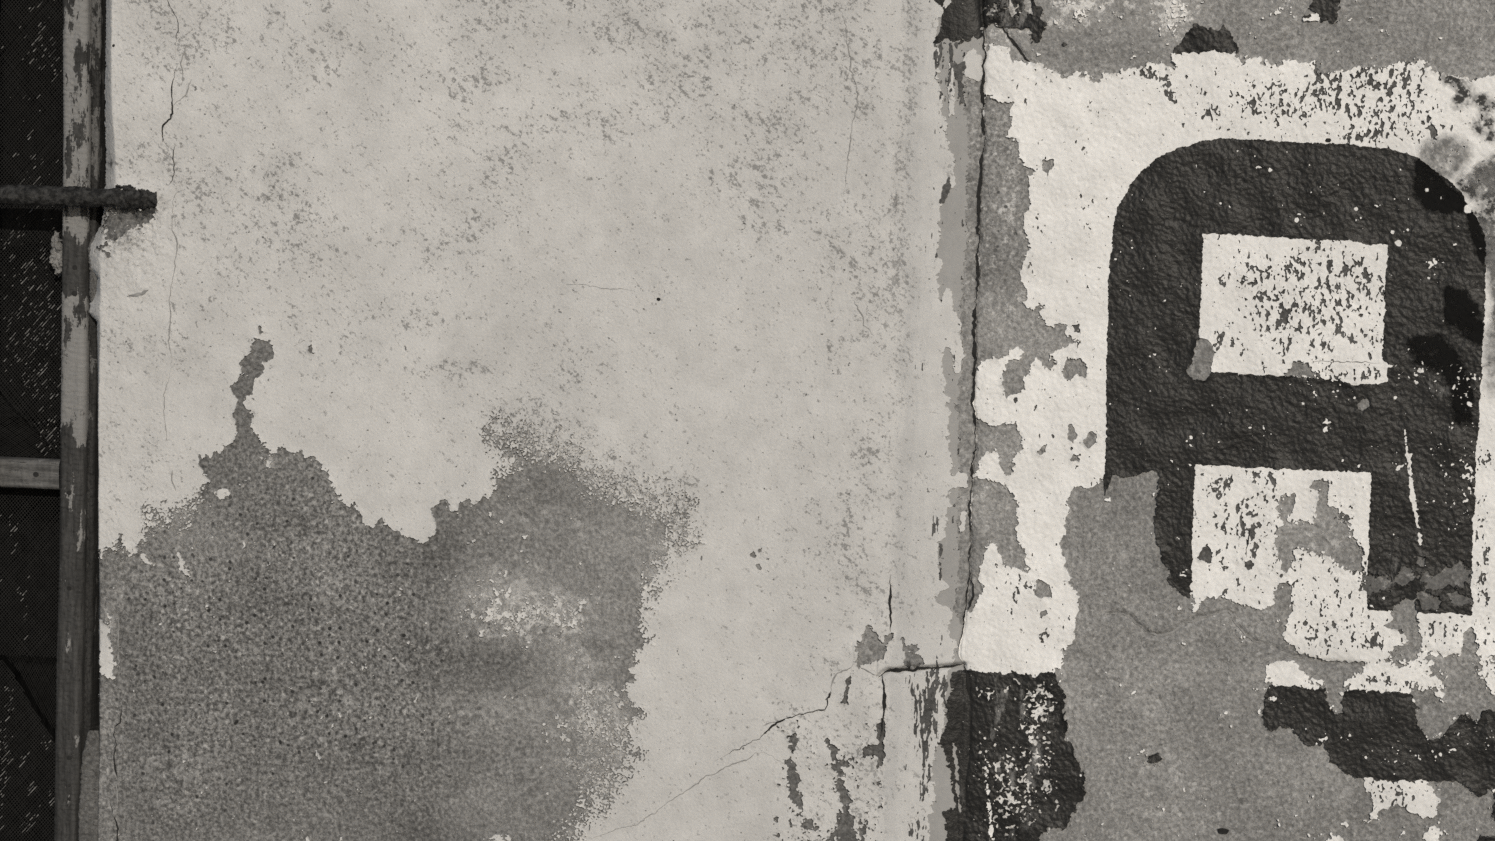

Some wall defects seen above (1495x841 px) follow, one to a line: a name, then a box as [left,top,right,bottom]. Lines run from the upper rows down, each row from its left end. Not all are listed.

crack [127,0,191,490]
flaking render [98,326,703,841]
crack [581,0,1030,839]
flaking render [774,718,886,841]
flaking render [841,619,925,705]
peeling [952,0,1495,841]